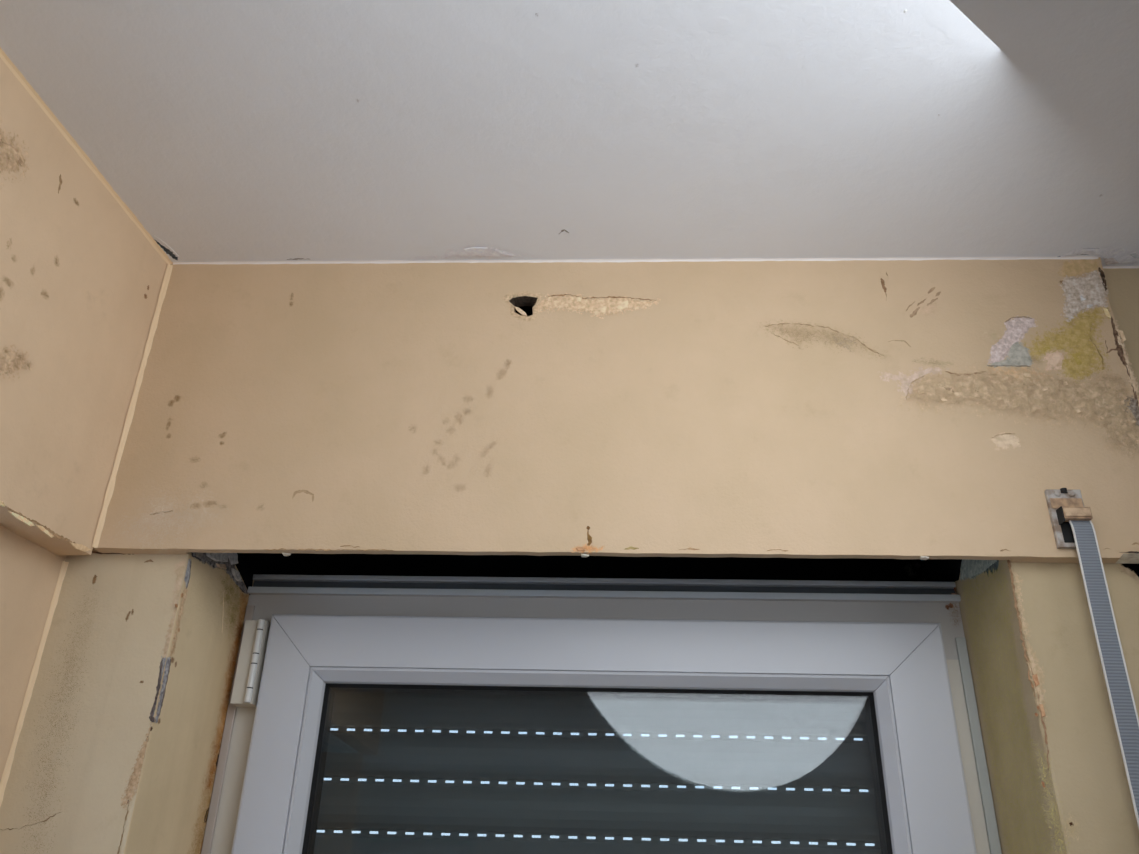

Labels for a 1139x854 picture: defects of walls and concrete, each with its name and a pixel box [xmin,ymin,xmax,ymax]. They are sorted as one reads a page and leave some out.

peeling [509,293,661,319]
peeling [1057,258,1111,322]
peeling [756,319,911,363]
peeling [982,316,1038,368]
crack [1098,267,1139,426]
peeling [0,500,91,552]
flaking render [117,552,249,854]